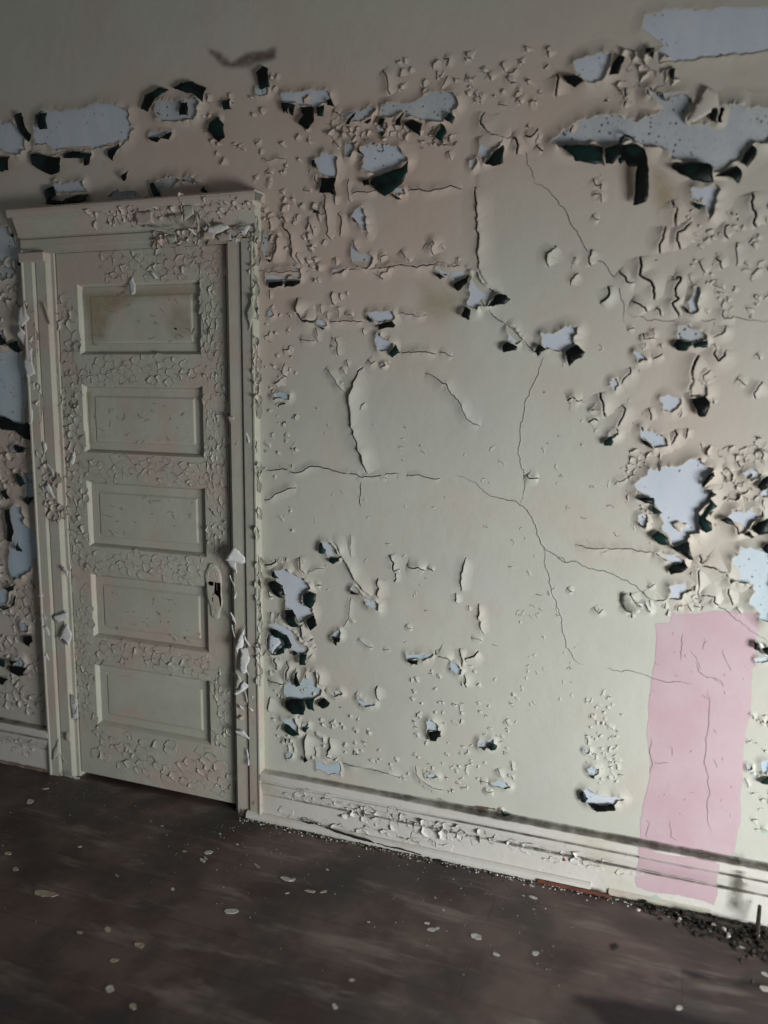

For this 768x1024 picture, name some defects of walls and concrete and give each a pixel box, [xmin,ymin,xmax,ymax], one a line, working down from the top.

peeling [0,0,768,817]
crack [375,66,400,97]
crack [253,104,768,827]
peeling [278,788,644,876]